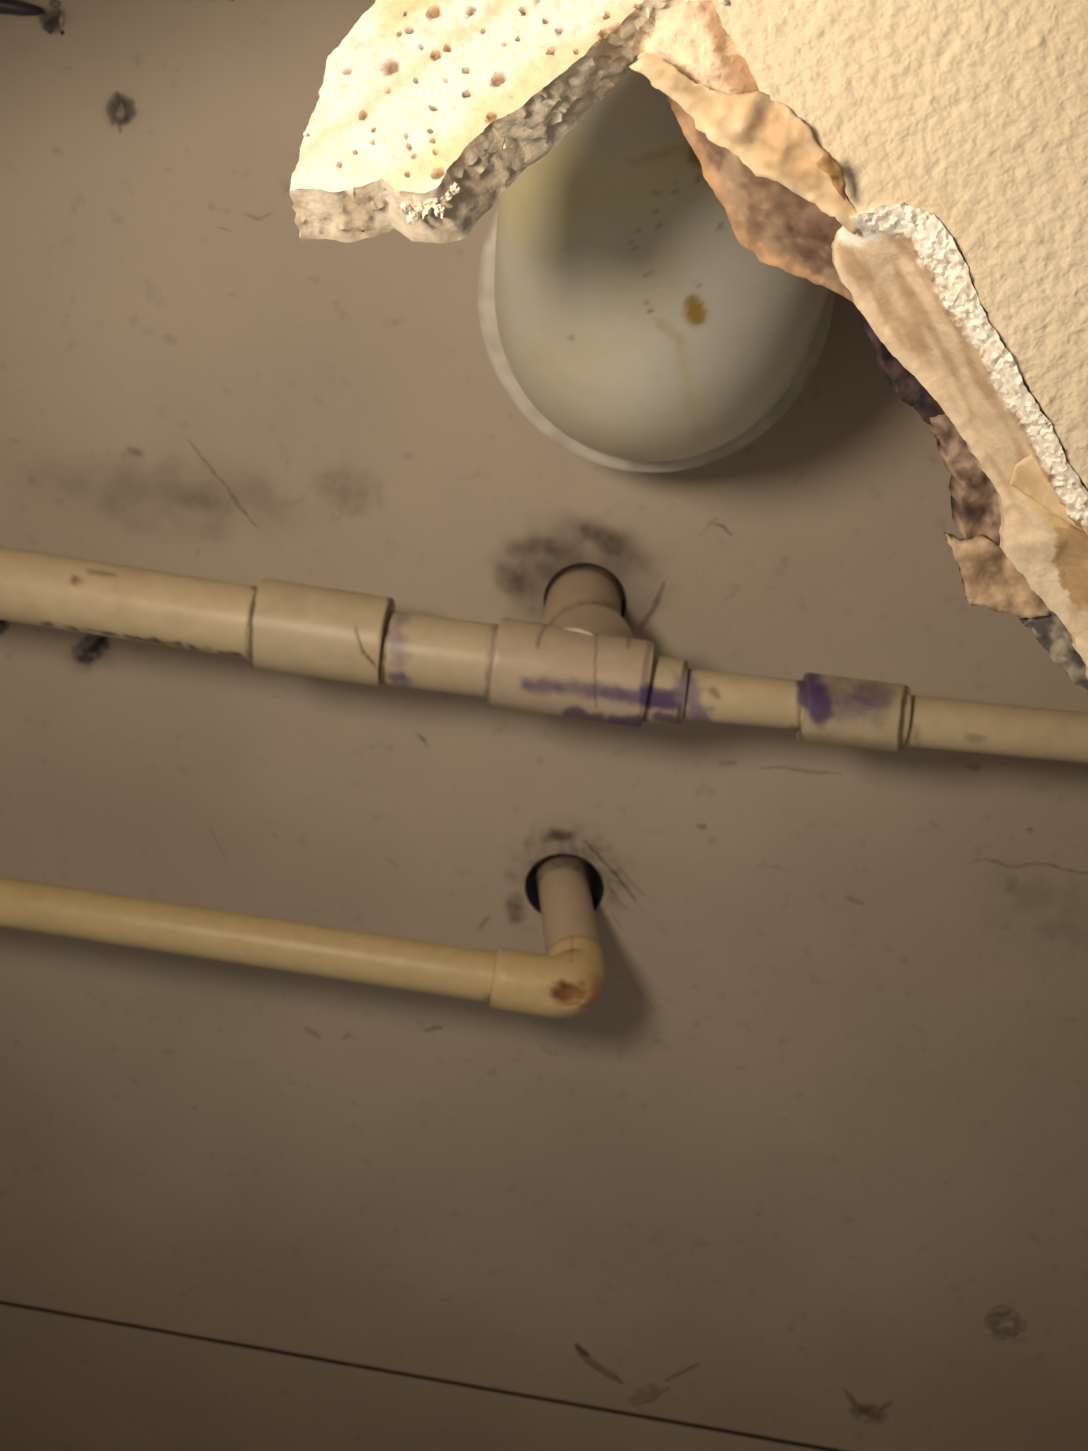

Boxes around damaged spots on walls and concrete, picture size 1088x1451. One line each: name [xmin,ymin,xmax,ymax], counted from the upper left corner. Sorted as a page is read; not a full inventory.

spalling [831,203,1088,679]